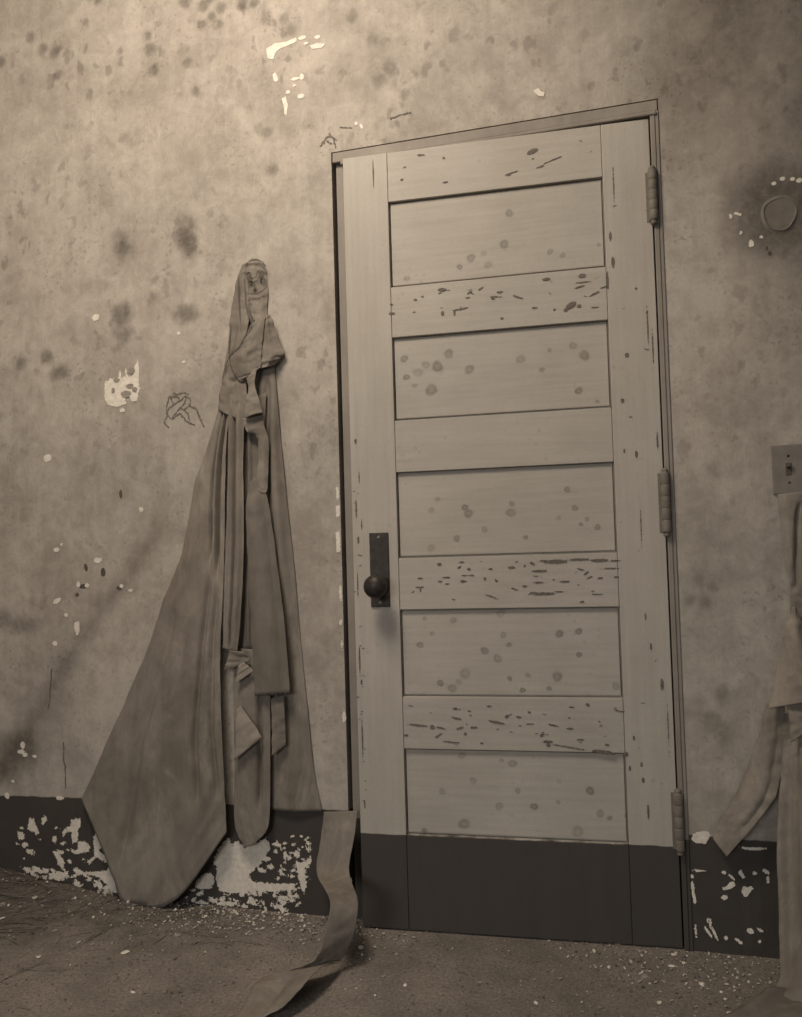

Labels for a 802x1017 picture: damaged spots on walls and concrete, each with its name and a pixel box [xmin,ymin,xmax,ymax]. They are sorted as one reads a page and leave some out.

peeling [266,35,325,59]
peeling [282,74,304,116]
peeling [104,360,140,412]
peeling [16,815,117,894]
peeling [186,835,312,912]
peeling [691,831,710,844]
peeling [721,868,770,900]
peeling [694,918,763,944]